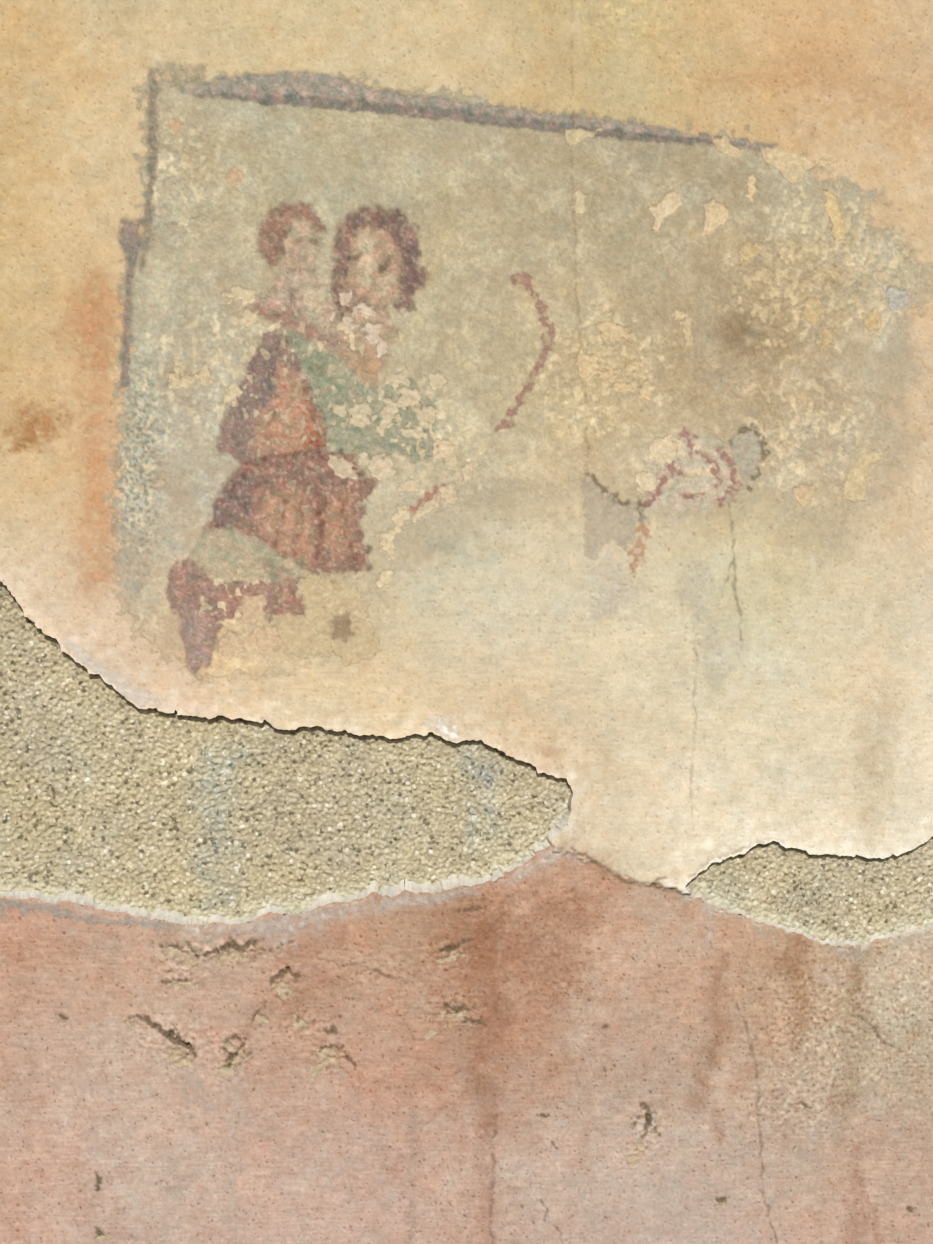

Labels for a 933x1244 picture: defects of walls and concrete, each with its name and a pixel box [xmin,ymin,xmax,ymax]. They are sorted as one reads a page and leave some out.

peeling [565,128,602,145]
peeling [648,191,682,231]
peeling [701,199,729,235]
peeling [221,286,258,327]
peeling [339,290,387,358]
peeling [168,363,243,405]
peeling [333,368,458,460]
peeling [587,434,678,506]
peeling [328,451,473,588]
flaking render [0,573,573,966]
flaking render [685,836,933,961]
flaking render [127,1015,196,1068]